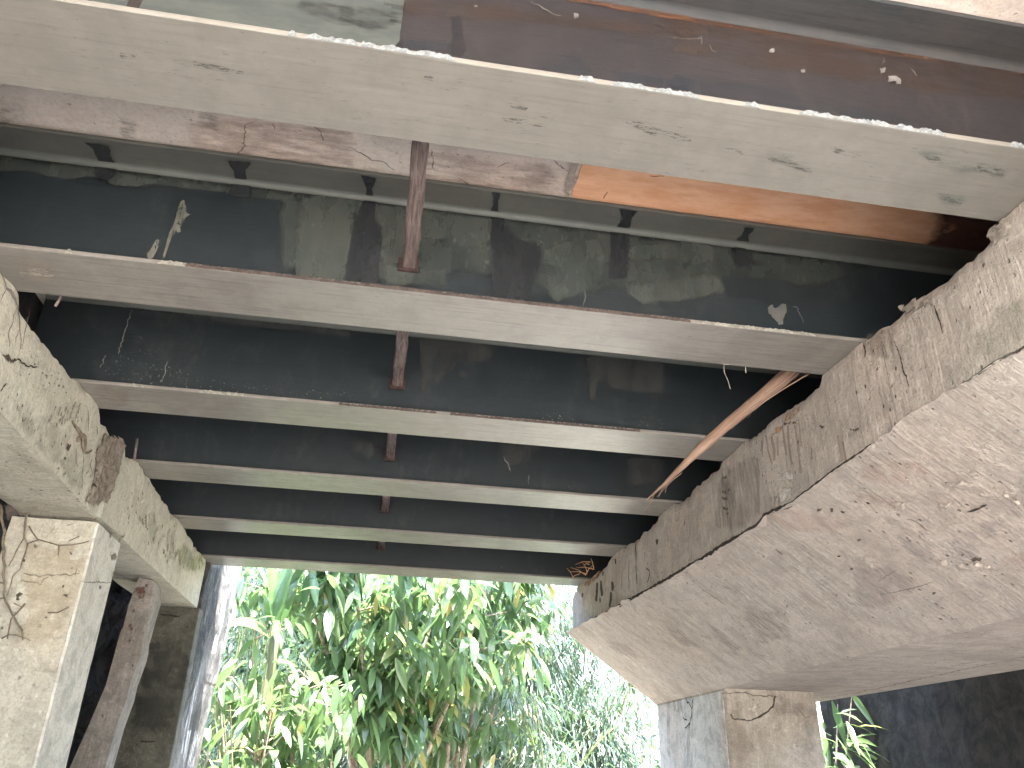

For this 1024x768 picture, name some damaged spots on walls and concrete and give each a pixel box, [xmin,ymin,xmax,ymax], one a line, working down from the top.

peeling [147,200,190,266]
peeling [701,304,815,336]
spalling [3,354,81,428]
crack [962,346,1024,383]
spalling [17,404,126,507]
crack [595,444,871,618]
crack [21,569,111,585]
crack [720,692,808,721]